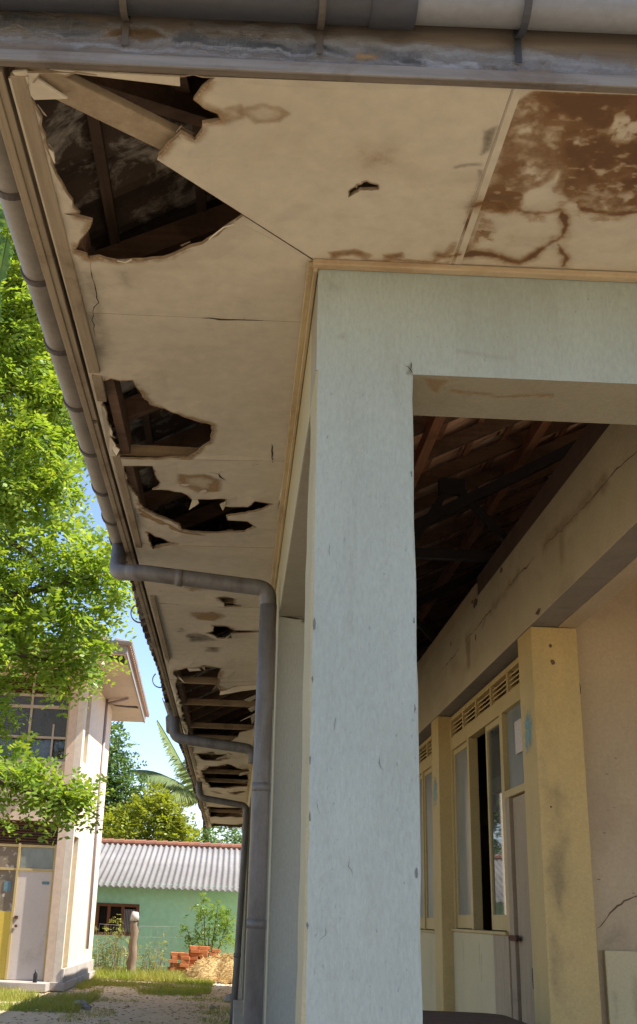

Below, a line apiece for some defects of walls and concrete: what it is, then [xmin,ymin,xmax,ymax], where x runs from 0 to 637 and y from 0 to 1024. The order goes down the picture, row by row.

water stain [385,91,637,267]
crack [90,264,99,334]
water stain [178,475,220,492]
crack [442,451,637,669]
peeling [220,685,256,724]
crack [598,893,637,928]